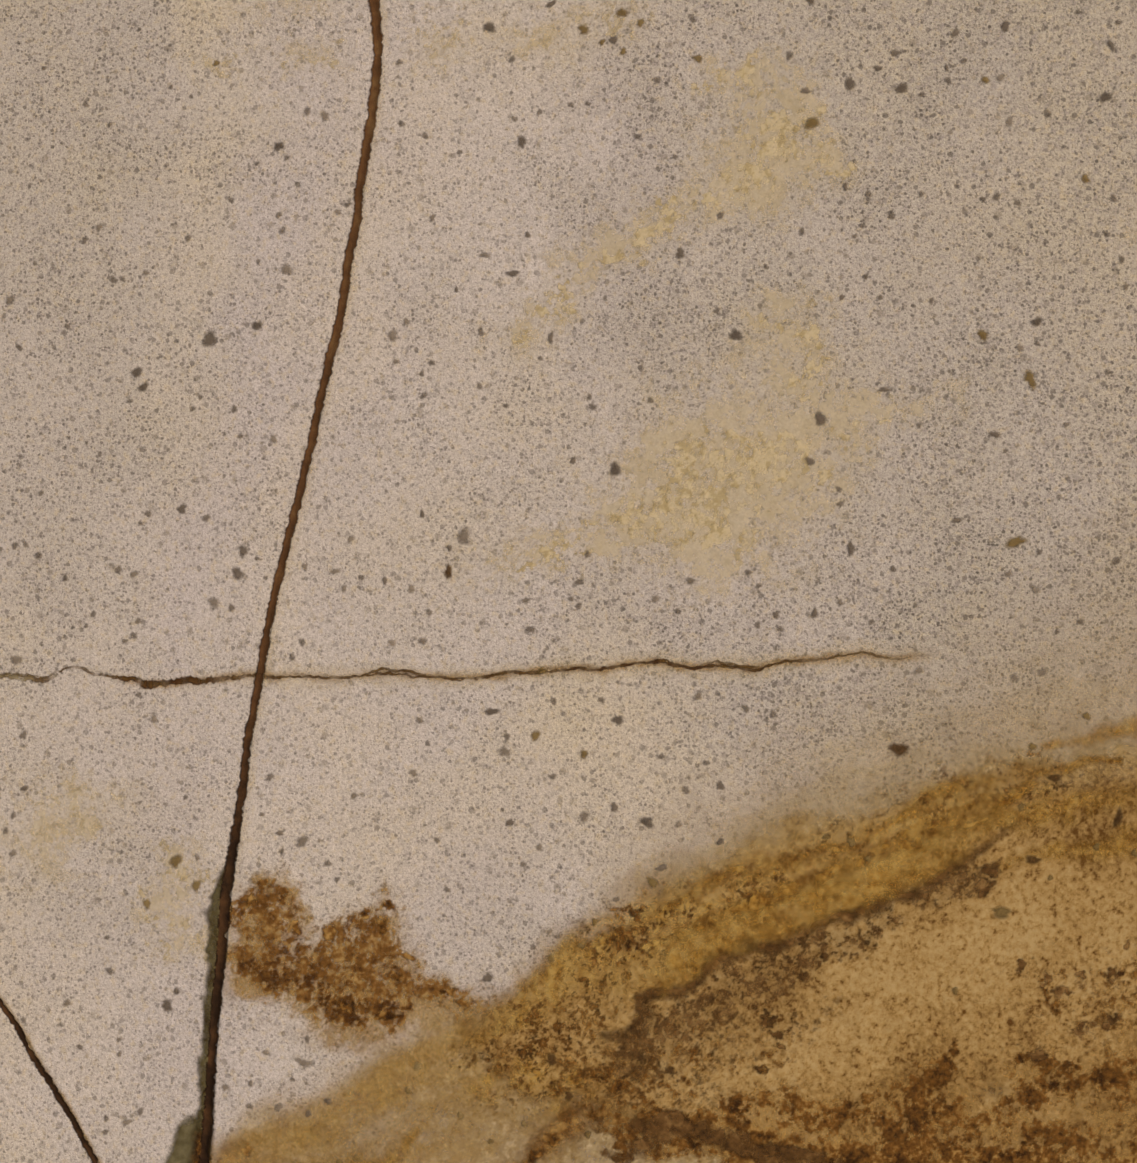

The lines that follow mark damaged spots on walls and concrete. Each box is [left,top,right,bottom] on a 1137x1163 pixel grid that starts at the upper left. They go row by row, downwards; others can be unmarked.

crack [0,0,887,1163]
leakage [139,842,225,1163]
leakage [233,722,1137,1163]